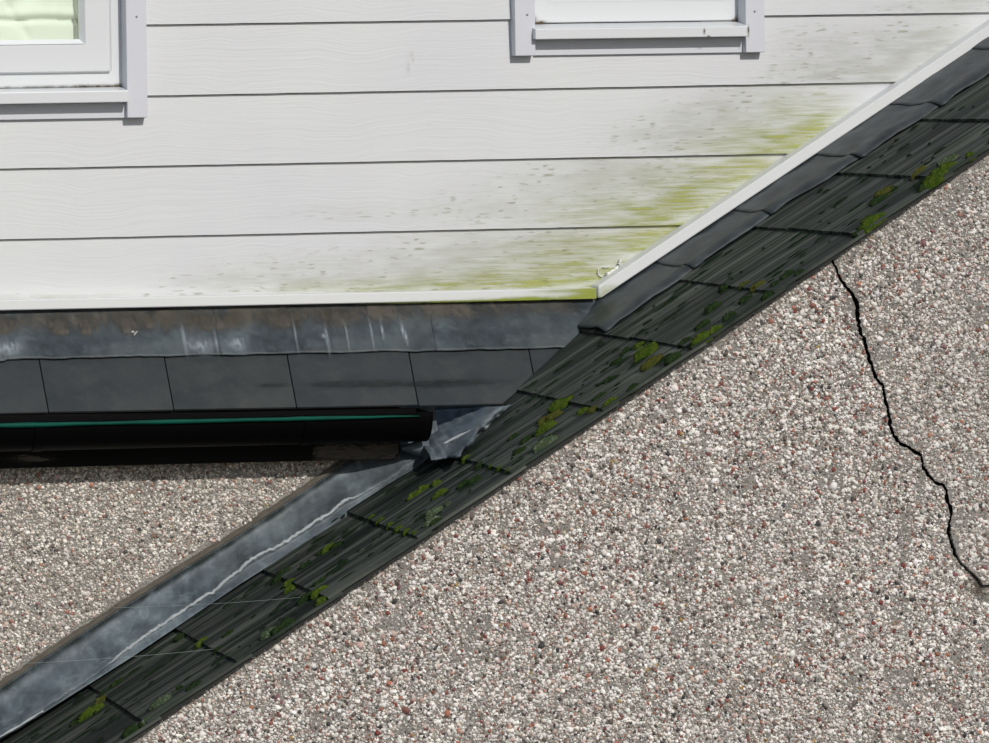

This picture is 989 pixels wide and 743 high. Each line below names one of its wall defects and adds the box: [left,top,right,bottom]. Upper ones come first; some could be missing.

crack [831,260,988,586]